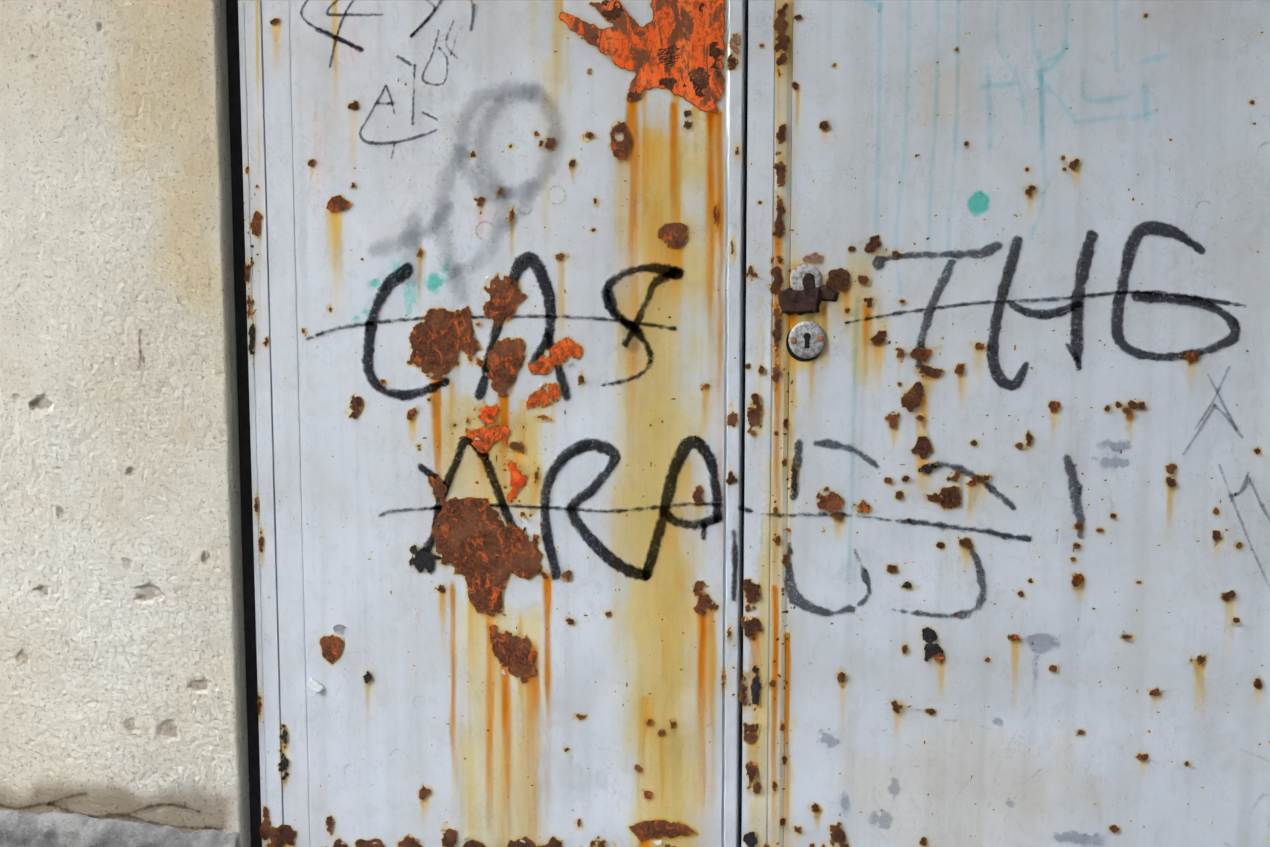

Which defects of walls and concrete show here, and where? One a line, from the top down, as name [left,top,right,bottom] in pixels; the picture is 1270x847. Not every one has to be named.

peeling [559,0,725,114]
rust [772,124,794,239]
rust [803,253,877,315]
rust [727,256,797,490]
rust [870,326,964,428]
rust [806,487,876,532]
rust [879,436,936,500]
rust [927,470,992,510]
rust [922,627,945,664]
rust [260,806,297,847]
rust [326,816,423,847]
rust [629,820,695,847]